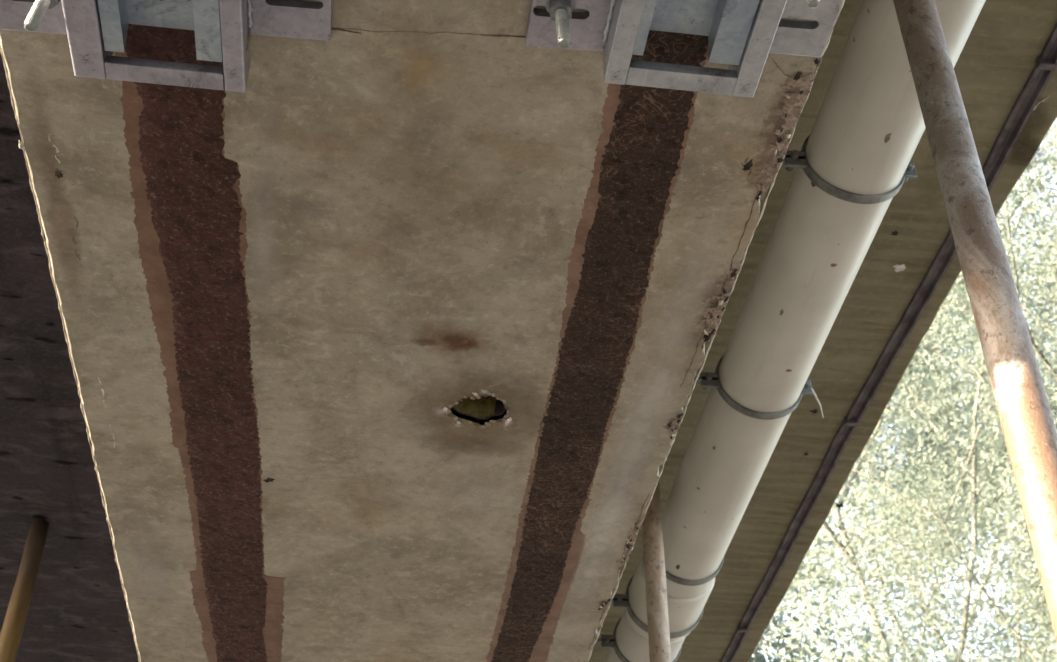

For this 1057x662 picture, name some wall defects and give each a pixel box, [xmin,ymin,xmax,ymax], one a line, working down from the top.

crack [332,28,525,38]
spalling [742,51,825,209]
spalling [700,261,741,348]
rust [418,332,475,348]
spalling [437,389,512,429]
spalling [663,412,684,439]